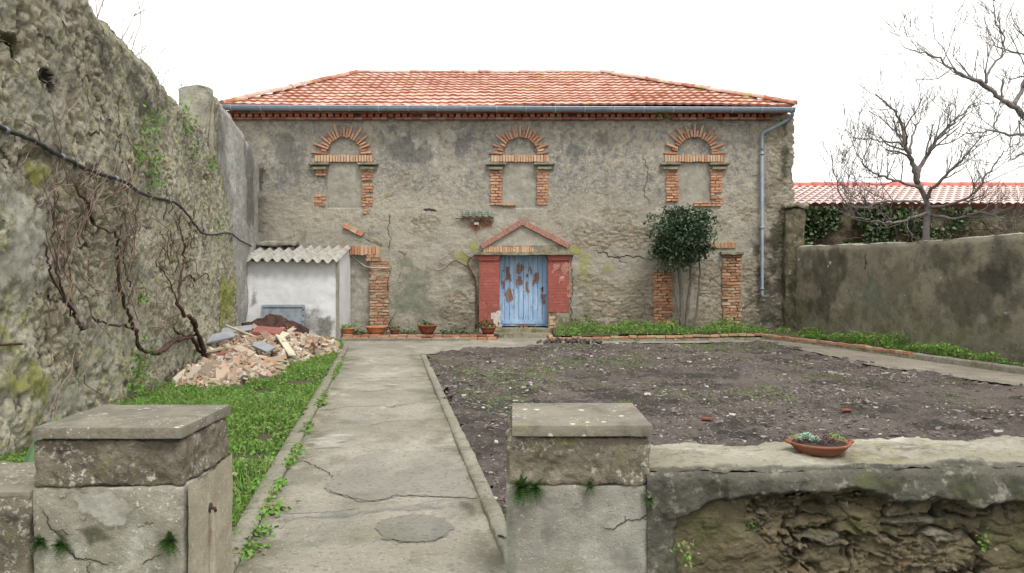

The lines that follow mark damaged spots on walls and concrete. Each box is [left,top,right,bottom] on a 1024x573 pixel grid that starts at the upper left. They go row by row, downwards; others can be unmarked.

crack [569,232,646,322]
crack [605,486,680,530]